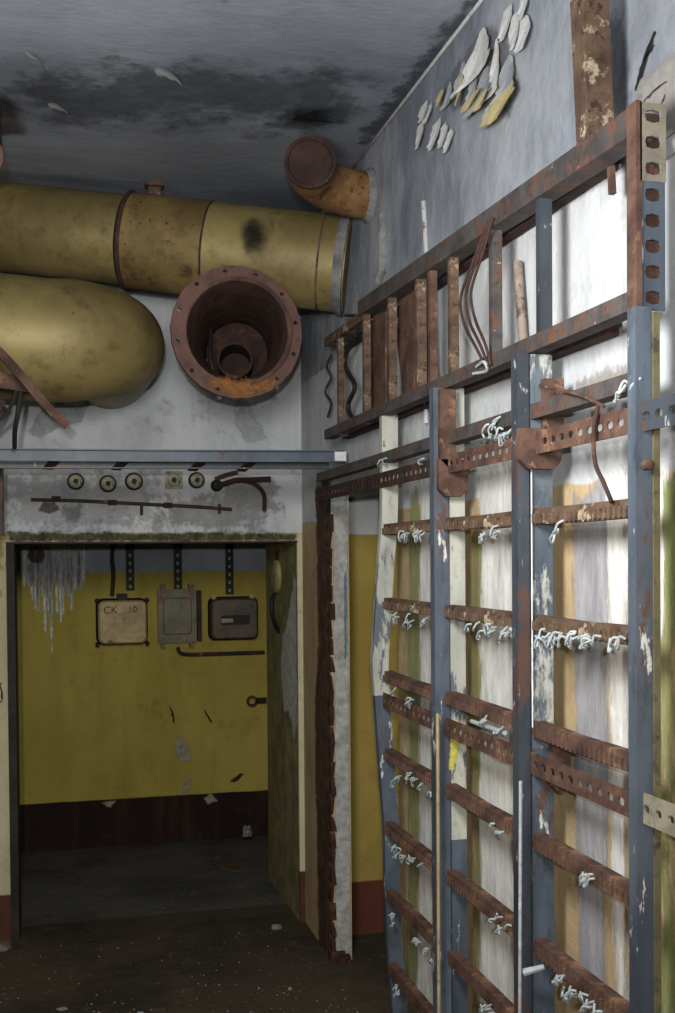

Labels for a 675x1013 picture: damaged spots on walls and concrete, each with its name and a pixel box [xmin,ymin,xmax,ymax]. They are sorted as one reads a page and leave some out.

peeling [155,68,182,86]
leakage [359,0,478,144]
peeling [415,0,531,153]
leakage [23,544,85,652]
spalling [315,481,351,964]